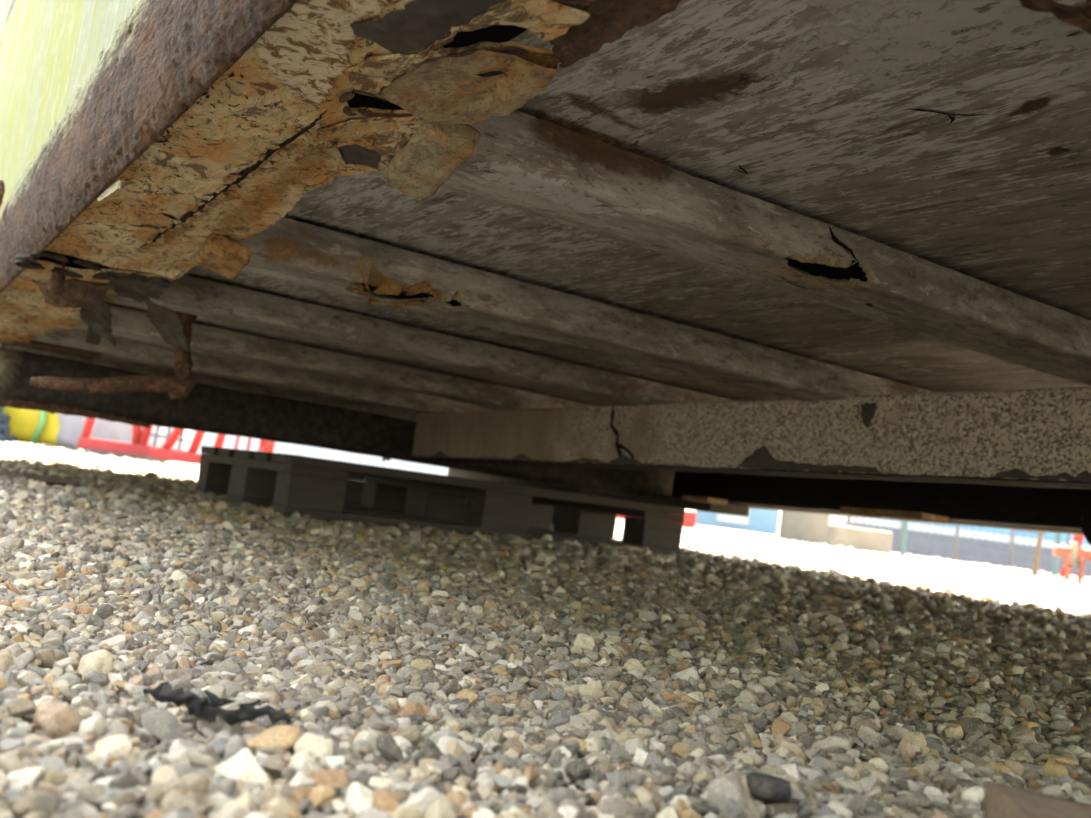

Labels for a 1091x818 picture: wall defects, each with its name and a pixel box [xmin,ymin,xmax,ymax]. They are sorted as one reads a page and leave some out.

peeling [348,0,590,95]
peeling [10,0,141,204]
crack [96,73,328,249]
peeling [313,116,424,171]
peeling [777,251,875,287]
crack [610,406,635,465]